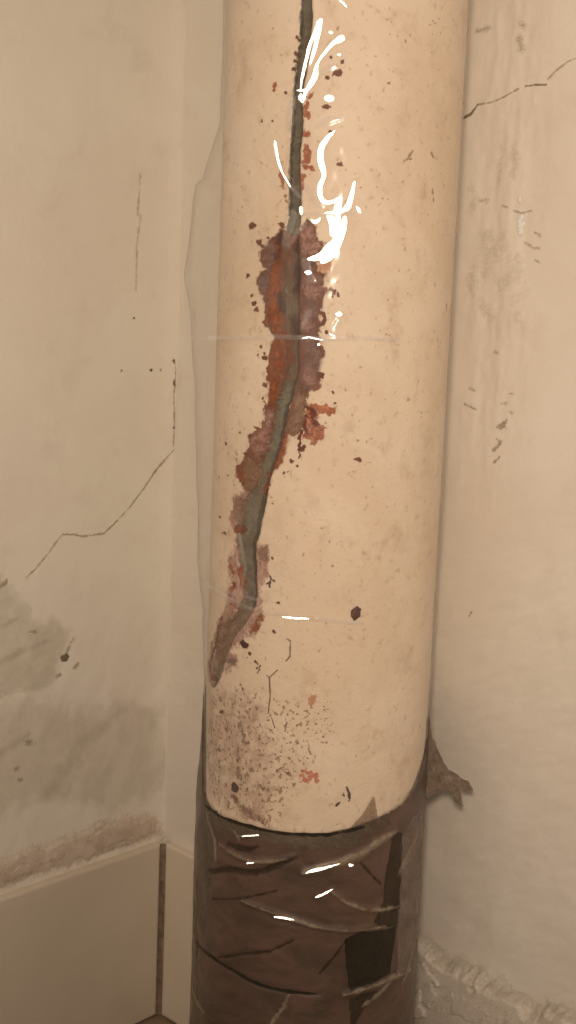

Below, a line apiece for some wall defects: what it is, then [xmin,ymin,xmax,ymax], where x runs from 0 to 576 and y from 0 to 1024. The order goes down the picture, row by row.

crack [462,60,570,119]
crack [211,0,313,687]
crack [30,359,176,574]
corrosion [208,219,340,685]
water stain [208,684,331,824]
crack [267,639,291,728]